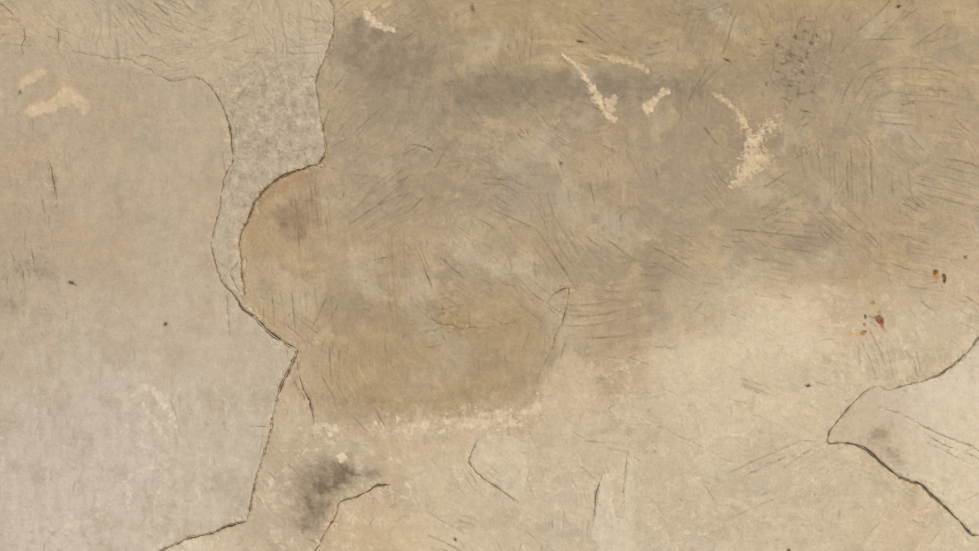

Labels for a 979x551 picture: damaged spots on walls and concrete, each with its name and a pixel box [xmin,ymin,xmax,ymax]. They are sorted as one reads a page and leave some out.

peeling [0,0,335,551]
crack [55,0,337,551]
leakage [264,184,333,248]
crack [303,482,391,551]
peeling [470,436,528,503]
leakage [285,229,939,491]